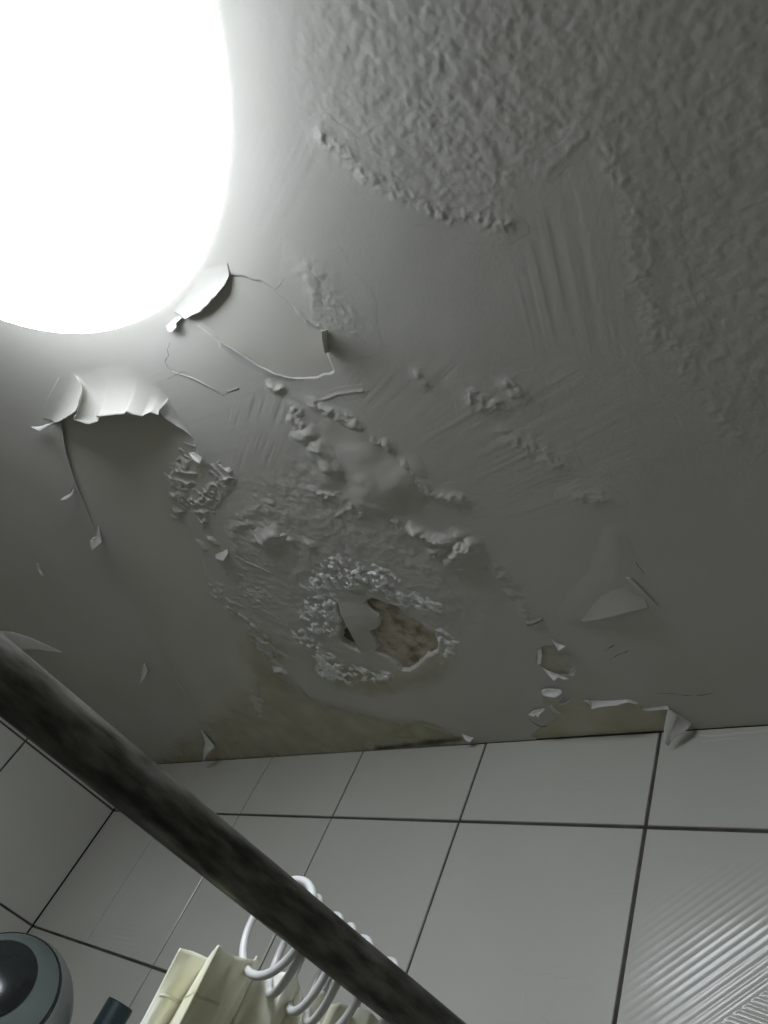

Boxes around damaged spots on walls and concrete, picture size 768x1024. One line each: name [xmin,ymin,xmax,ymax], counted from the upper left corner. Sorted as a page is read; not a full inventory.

crack [165,344,239,396]
peeling [166,263,333,381]
peeling [32,365,473,761]
water stain [180,678,455,760]
water stain [286,553,443,687]
water stain [435,628,460,658]
peeling [528,639,692,746]